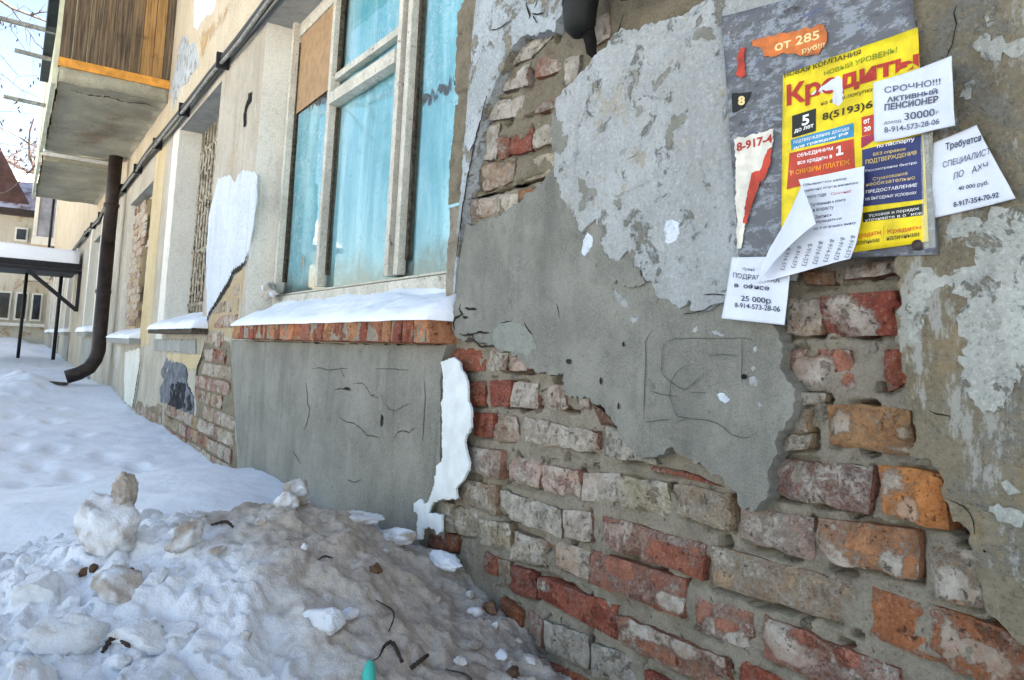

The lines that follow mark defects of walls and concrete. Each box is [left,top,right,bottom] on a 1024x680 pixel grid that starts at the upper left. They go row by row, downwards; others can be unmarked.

peeling [972,7,1024,65]
peeling [959,77,975,100]
peeling [446,0,782,324]
spalling [124,170,258,468]
crack [453,303,532,348]
crack [305,367,426,442]
spalling [414,206,1024,680]